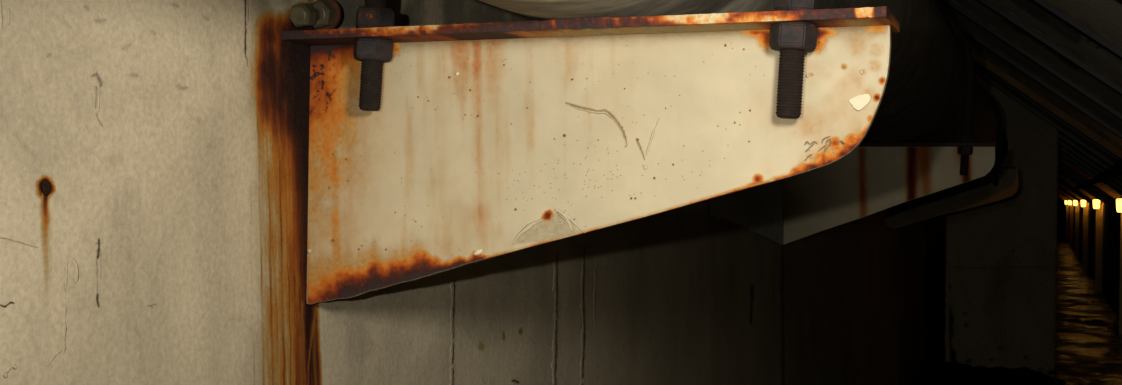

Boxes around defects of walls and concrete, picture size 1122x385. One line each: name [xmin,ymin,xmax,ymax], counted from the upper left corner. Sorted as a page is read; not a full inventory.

rust [36,175,56,258]
rust [254,0,511,385]
rust [624,115,873,222]
rust [886,147,1017,228]